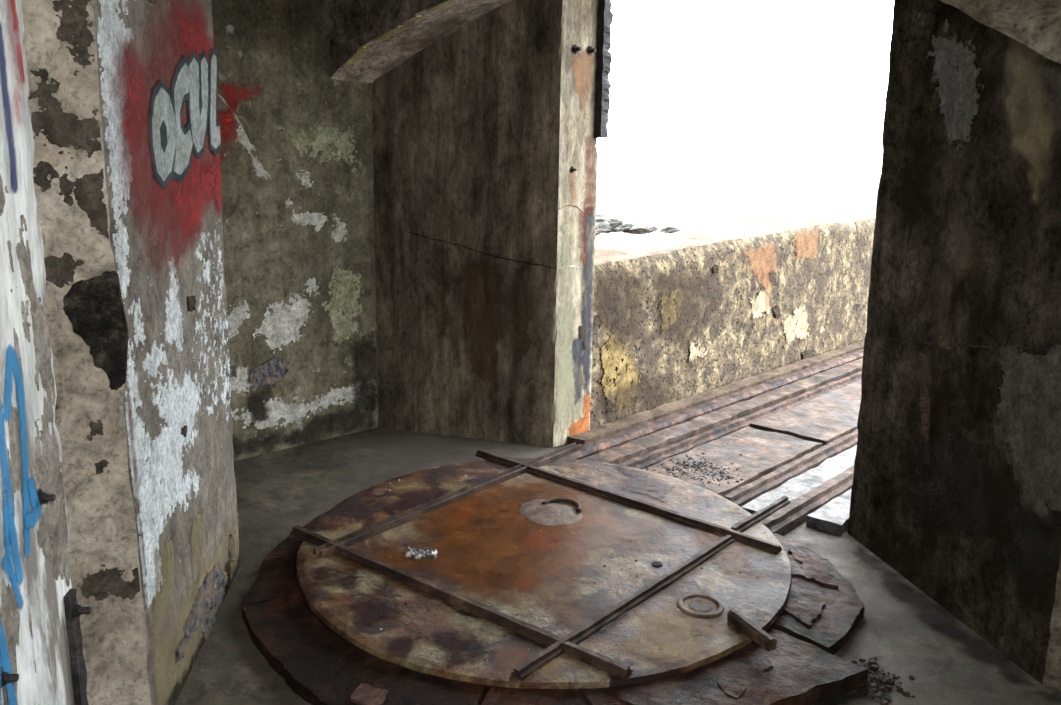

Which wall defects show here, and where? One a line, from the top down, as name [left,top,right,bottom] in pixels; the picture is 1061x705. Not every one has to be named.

peeling [916,12,984,151]
corrosion [570,134,596,267]
peeling [0,0,365,608]
corrosion [569,394,590,436]
peeling [0,577,33,705]